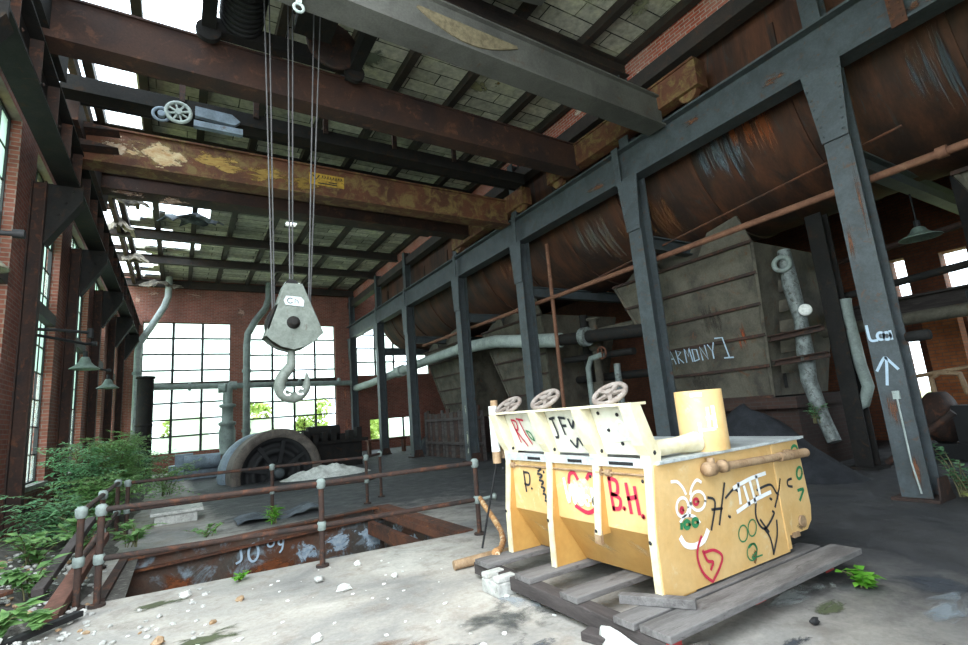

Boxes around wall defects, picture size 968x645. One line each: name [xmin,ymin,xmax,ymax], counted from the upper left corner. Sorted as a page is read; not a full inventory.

rust [906,34,968,105]
peeling [102,136,321,191]
rust [696,112,776,177]
rust [163,577,191,590]
rust [252,557,293,573]